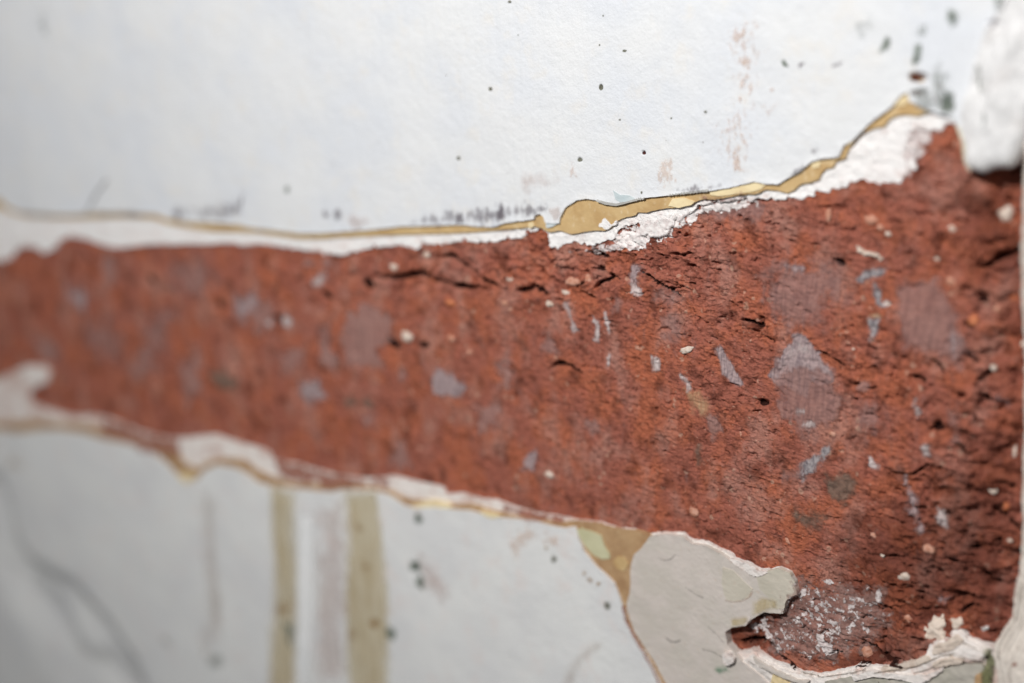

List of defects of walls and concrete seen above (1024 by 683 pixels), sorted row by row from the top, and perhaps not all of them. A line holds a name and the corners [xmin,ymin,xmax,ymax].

spalling [909,73,925,82]
spalling [701,92,955,204]
spalling [0,199,559,261]
peeling [546,189,717,251]
flaking render [252,302,273,325]
spalling [0,365,619,528]
water stain [272,491,296,683]
water stain [347,494,395,683]
peeling [567,520,665,683]
peeling [627,531,800,683]
peeling [738,646,885,683]
peeling [852,630,988,683]